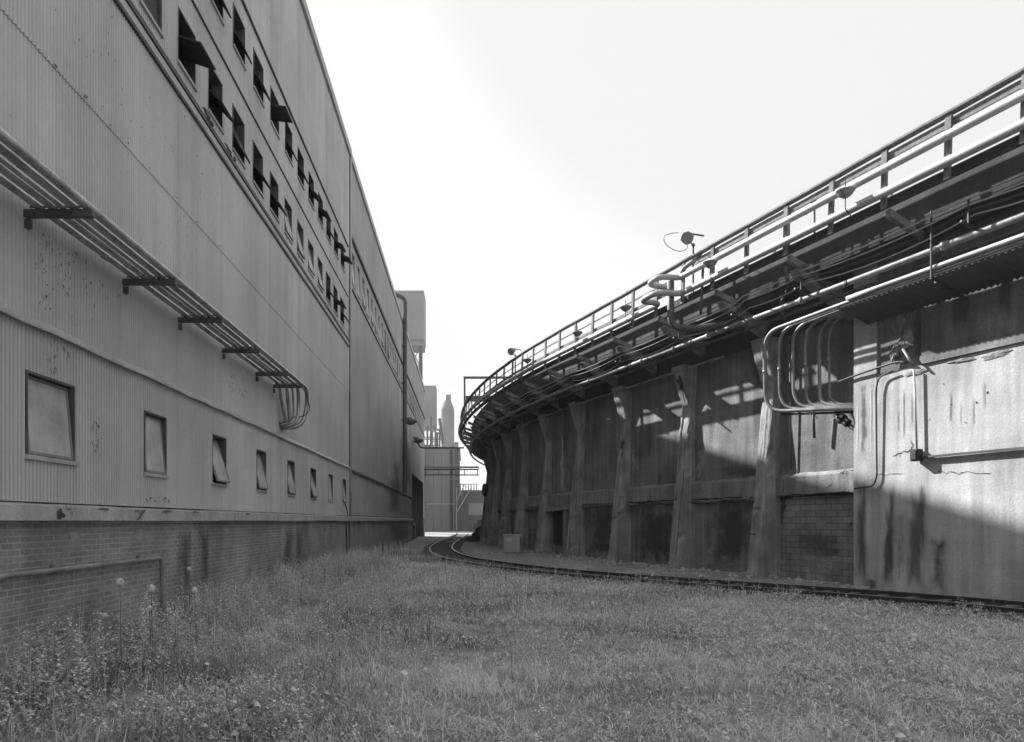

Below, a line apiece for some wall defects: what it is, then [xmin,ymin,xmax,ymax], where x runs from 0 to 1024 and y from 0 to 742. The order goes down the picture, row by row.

damp [870,489,924,587]